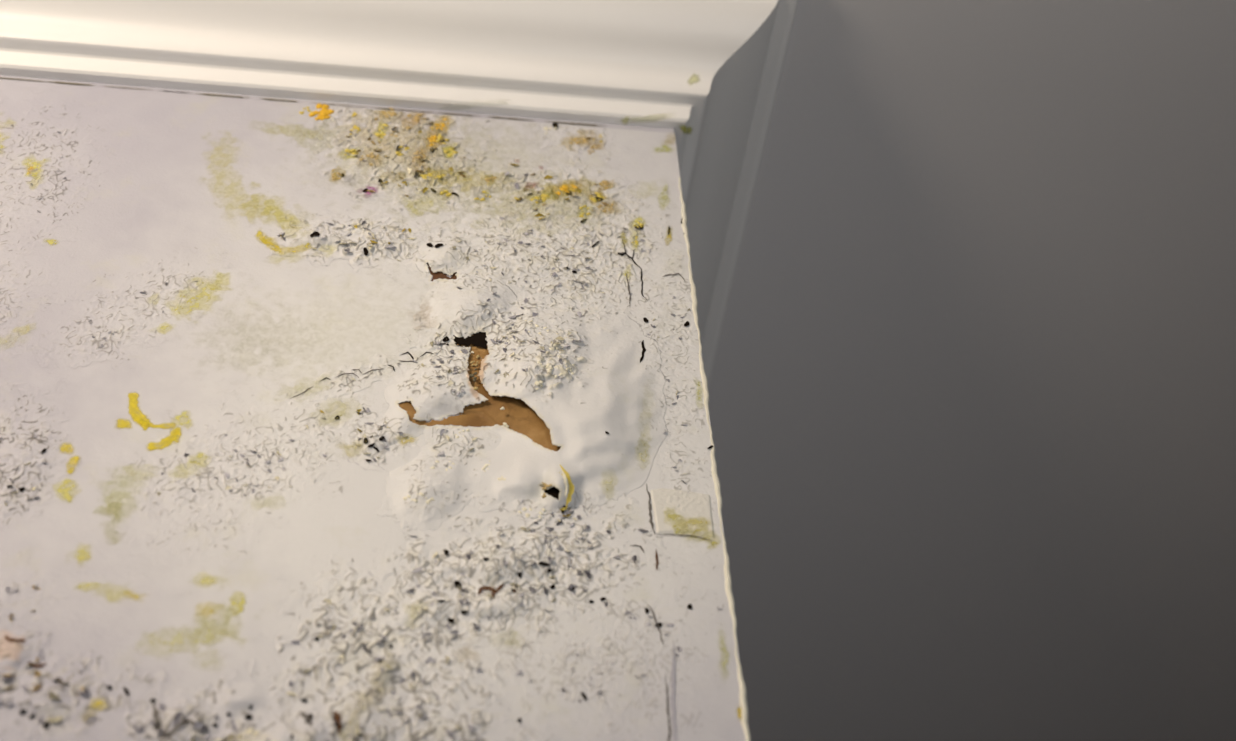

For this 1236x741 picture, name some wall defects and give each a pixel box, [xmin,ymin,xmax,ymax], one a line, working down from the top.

mould [299,103,334,120]
mould [344,107,459,197]
leakage [530,180,614,217]
peeling [0,83,736,741]
leakage [539,465,574,511]